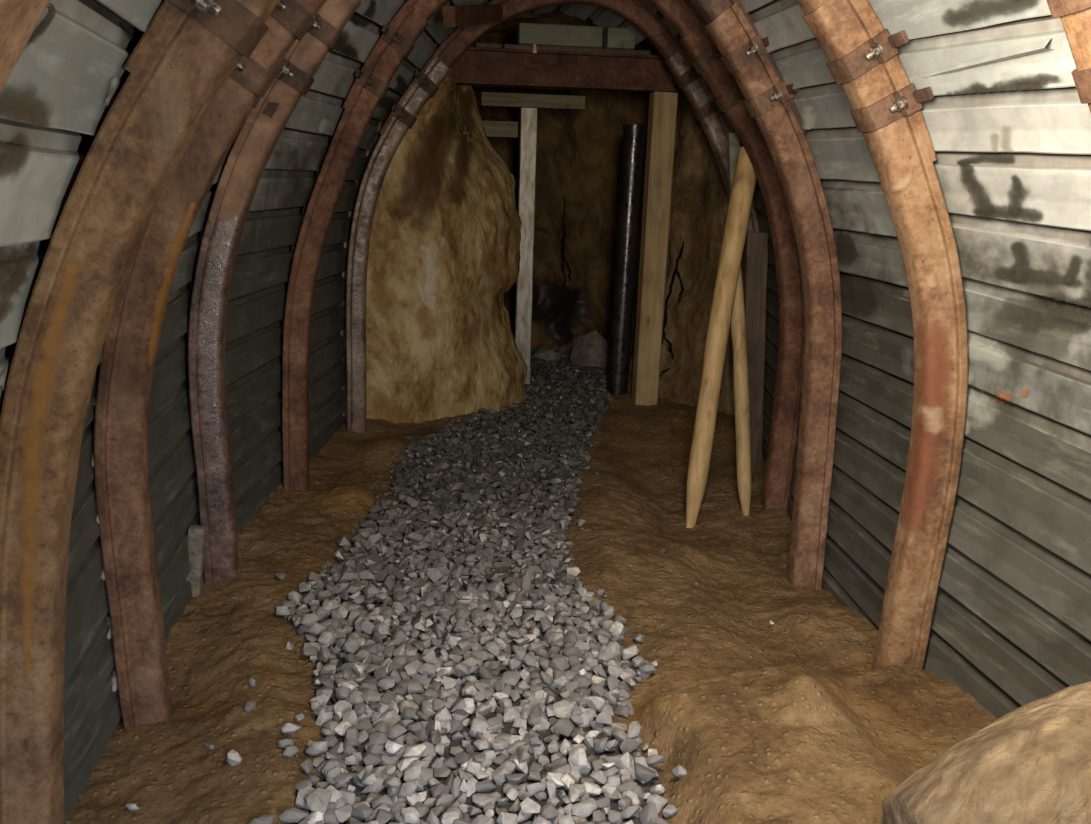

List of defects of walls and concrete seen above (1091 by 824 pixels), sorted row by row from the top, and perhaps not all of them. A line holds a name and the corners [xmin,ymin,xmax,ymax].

leakage [944,0,1037,26]
leakage [0,89,49,176]
leakage [958,152,1042,222]
leakage [0,245,36,322]
rust [149,203,194,365]
leakage [995,242,1091,332]